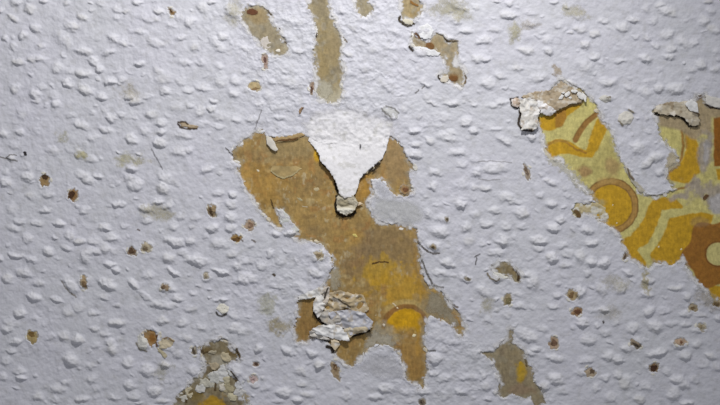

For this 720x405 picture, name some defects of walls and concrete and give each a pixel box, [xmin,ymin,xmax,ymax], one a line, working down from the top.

peeling [231,0,468,405]
peeling [509,76,720,307]
peeling [487,260,524,283]
spalling [136,329,175,358]
peeling [174,337,259,405]
peeling [480,326,546,405]